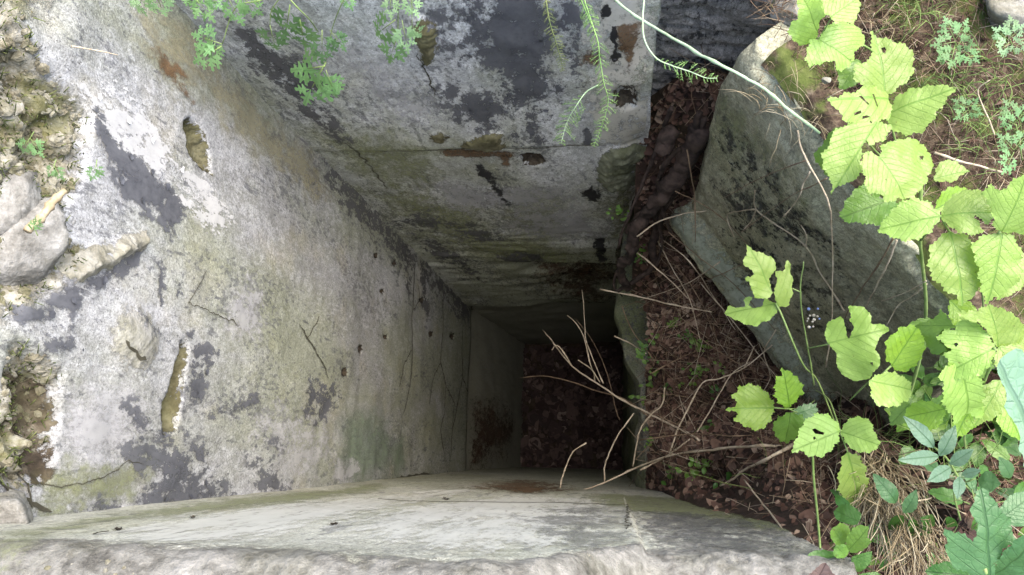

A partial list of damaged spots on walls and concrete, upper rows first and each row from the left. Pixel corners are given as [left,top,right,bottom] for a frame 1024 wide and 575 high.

corrosion [159,47,194,104]
peeling [411,0,586,152]
spalling [611,85,638,108]
corrosion [617,22,642,72]
corrosion [436,149,514,167]
peeling [9,72,235,359]
crack [189,272,236,324]
crack [299,317,328,377]
peeling [118,311,261,505]
crack [0,460,140,512]